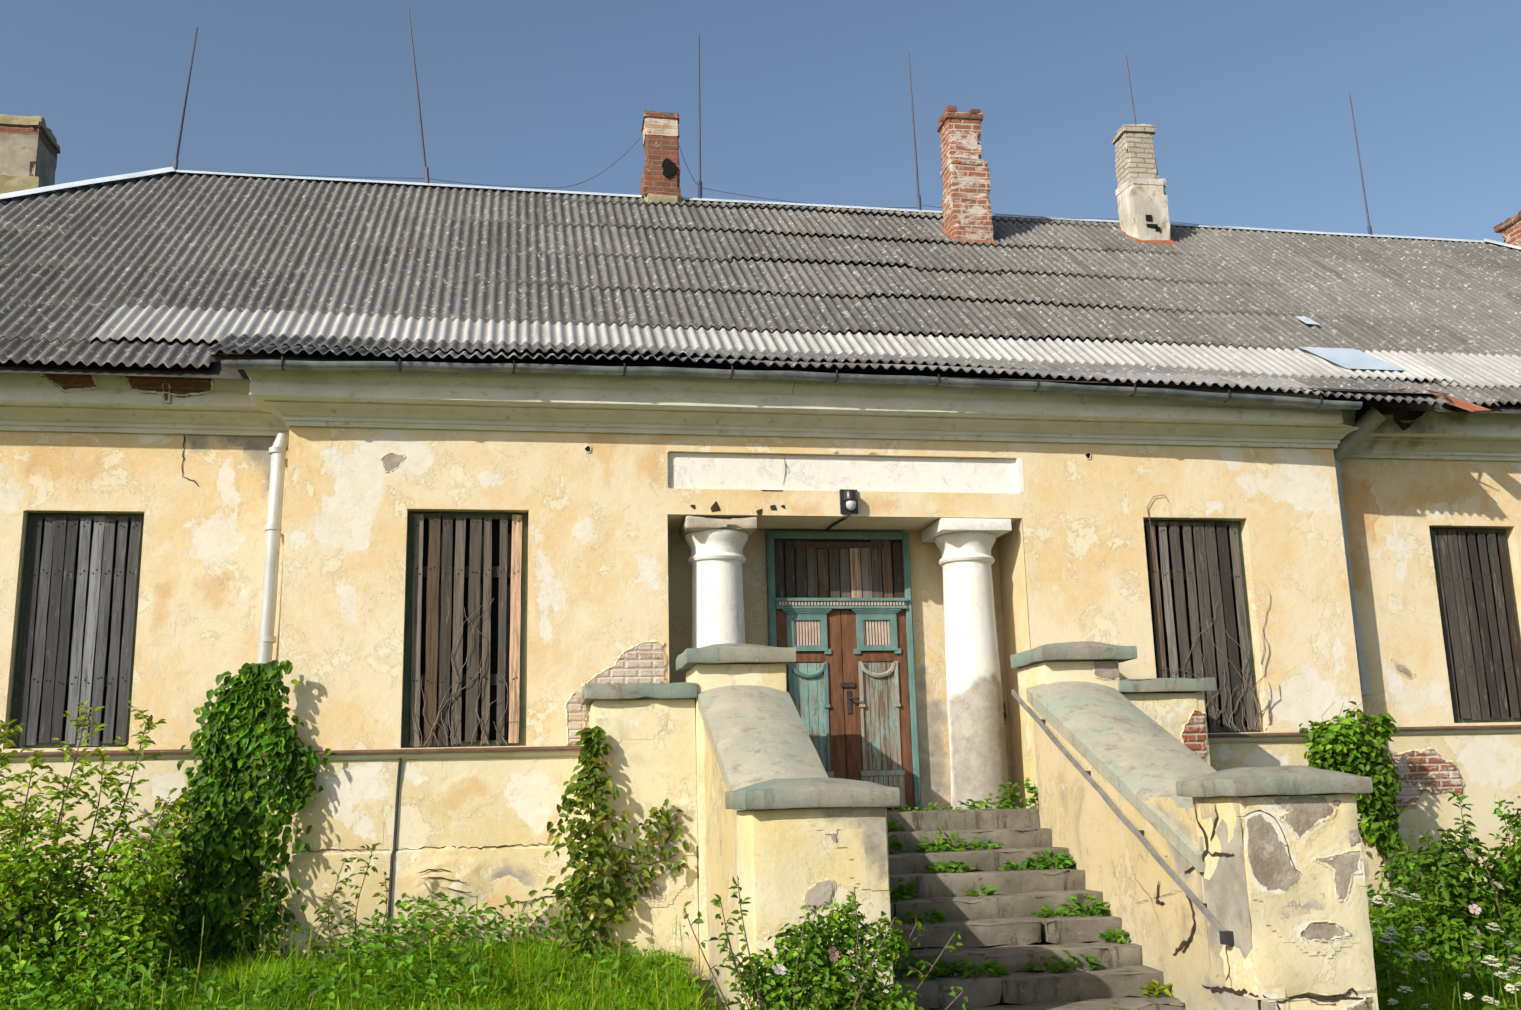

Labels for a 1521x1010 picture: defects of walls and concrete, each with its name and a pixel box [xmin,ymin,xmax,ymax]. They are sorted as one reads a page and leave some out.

spalling [37,373,100,392]
spalling [121,375,214,403]
crack [181,434,199,487]
spalling [564,639,669,752]
peeling [1153,626,1521,812]
crack [1135,803,1302,955]
spalling [1243,795,1366,958]
crack [1202,953,1370,1010]